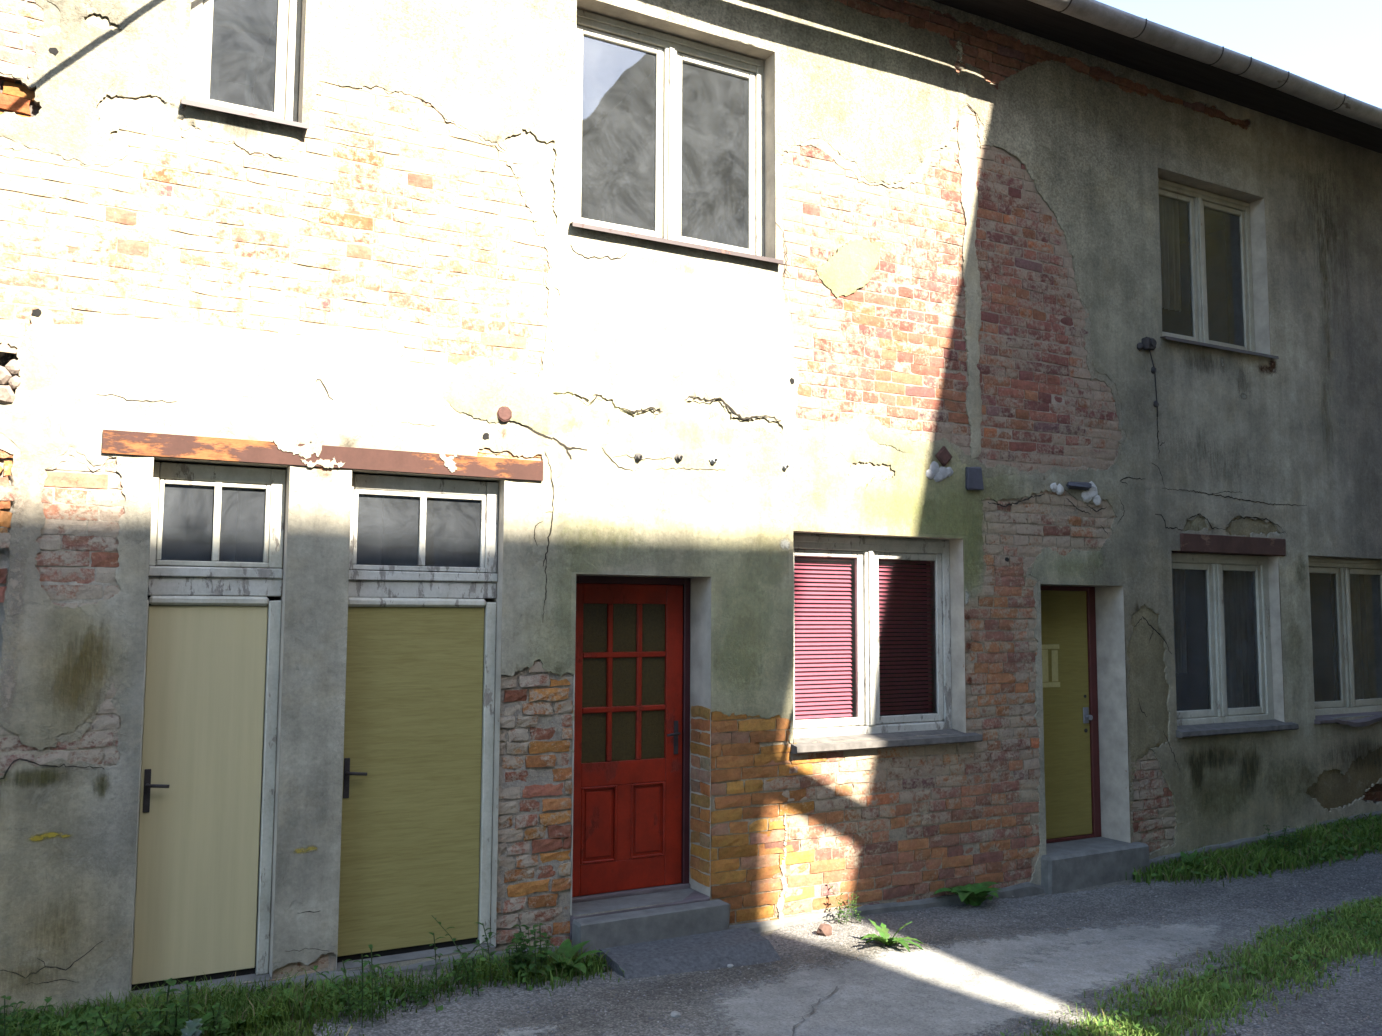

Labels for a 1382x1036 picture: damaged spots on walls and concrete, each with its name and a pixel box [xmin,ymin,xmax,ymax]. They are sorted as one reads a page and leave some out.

peeling [0,0,61,117]
peeling [84,14,121,33]
peeling [828,0,1250,130]
peeling [0,75,659,436]
spalling [0,433,21,678]
peeling [35,446,126,609]
peeling [273,434,344,468]
crack [511,421,722,615]
crack [577,394,781,421]
peeling [686,104,1126,925]
spalling [475,659,573,951]
peeling [1125,605,1178,854]